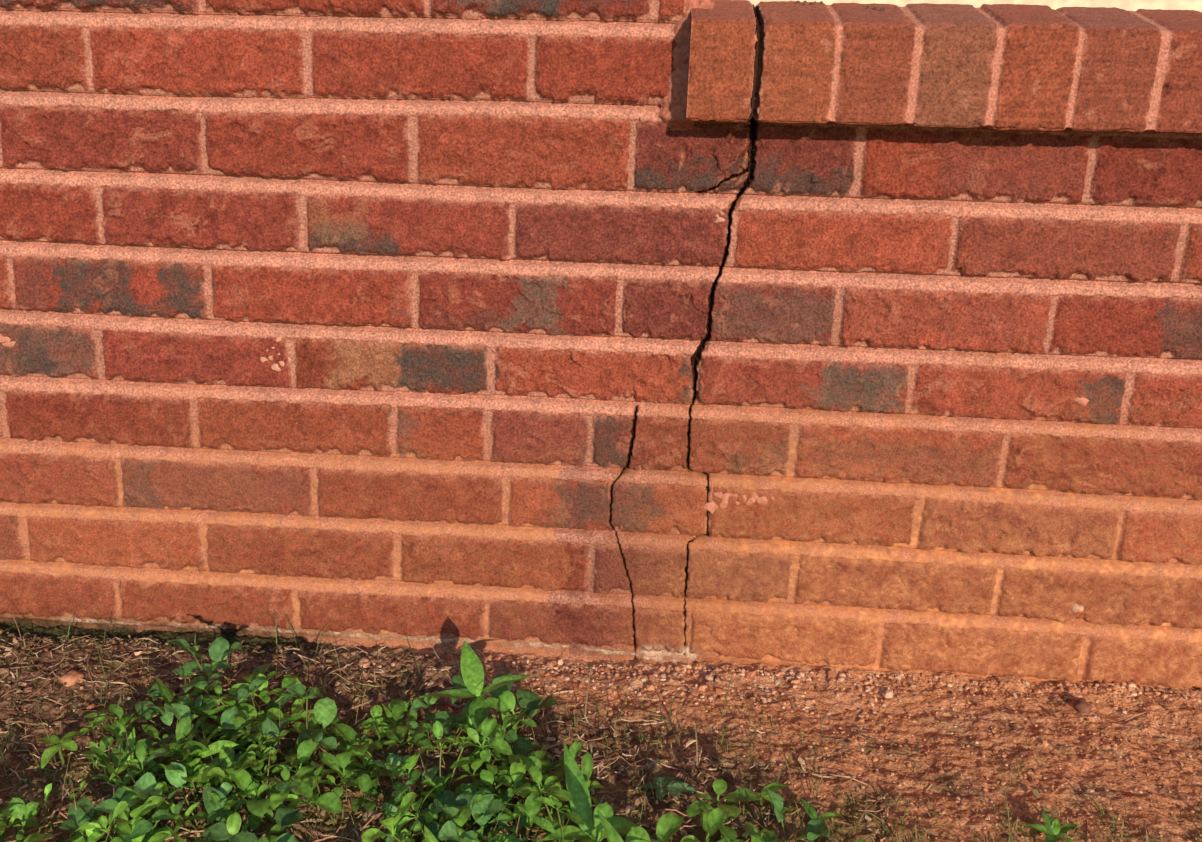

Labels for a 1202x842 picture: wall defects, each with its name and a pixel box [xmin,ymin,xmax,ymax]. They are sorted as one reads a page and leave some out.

crack [609,407,637,659]
crack [684,4,764,655]